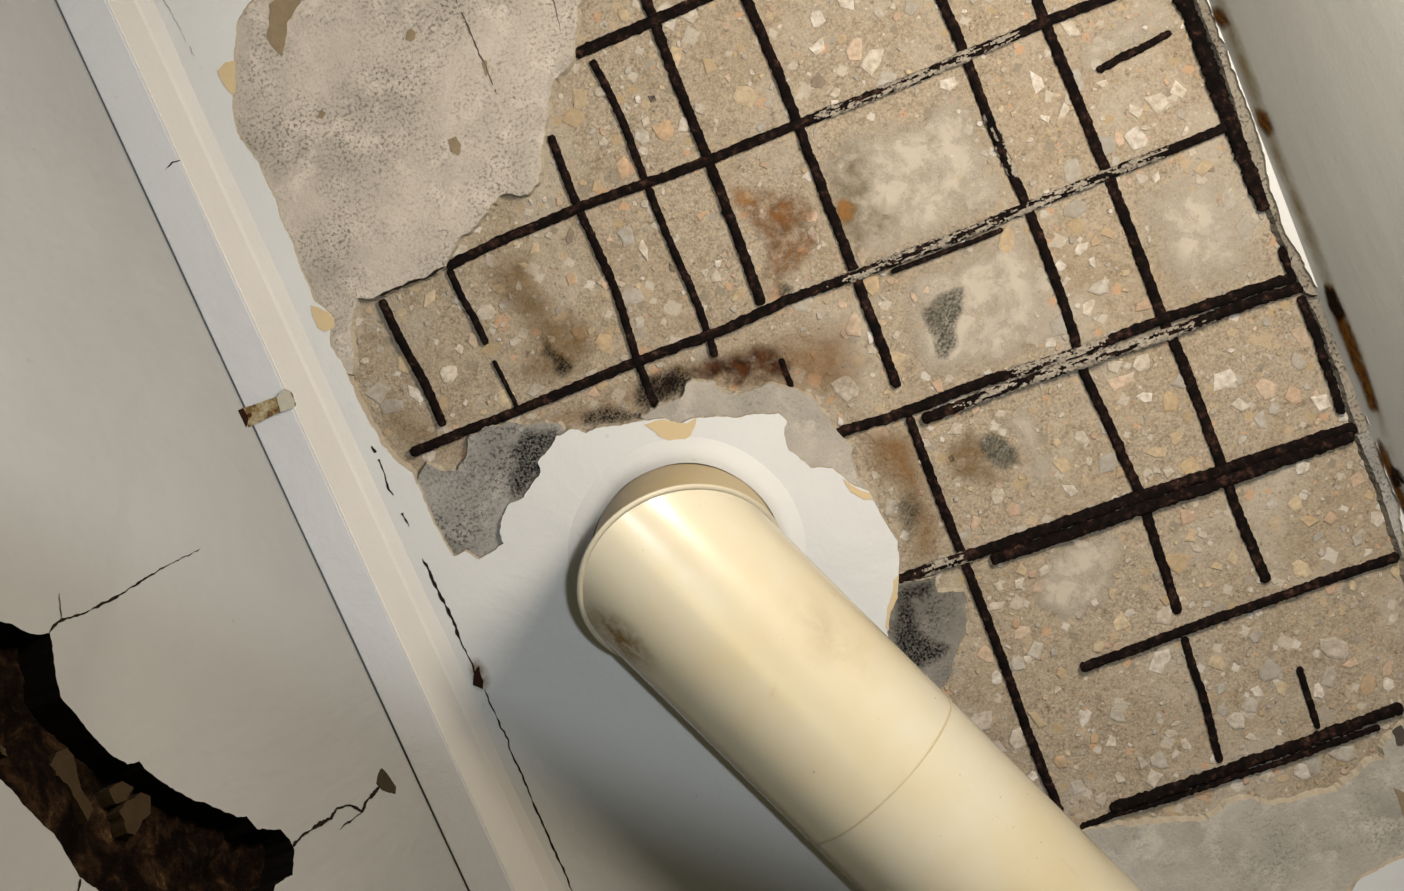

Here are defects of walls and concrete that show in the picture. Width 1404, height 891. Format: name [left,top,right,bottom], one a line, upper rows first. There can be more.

corrosion [1211,8,1229,27]
corrosion [1256,110,1273,135]
spalling [218,0,1270,574]
water stain [916,242,1049,365]
corrosion [1325,284,1378,411]
water stain [510,431,558,497]
spalling [836,0,1404,891]
crack [49,550,199,633]
water stain [896,586,947,666]
flaking render [0,646,265,891]
crack [293,768,396,847]
crack [423,560,572,890]